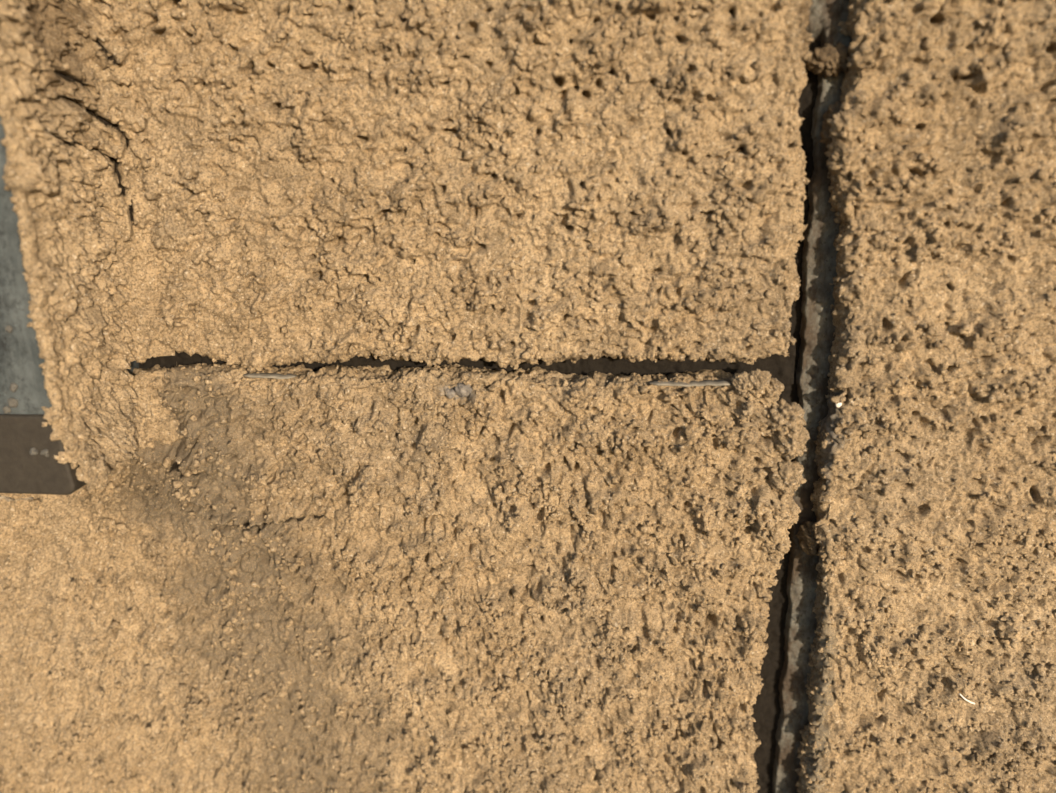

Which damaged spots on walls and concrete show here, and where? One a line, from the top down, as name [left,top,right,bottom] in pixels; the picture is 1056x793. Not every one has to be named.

crack [44,70,134,224]
crack [169,462,208,478]
crack [226,515,325,528]